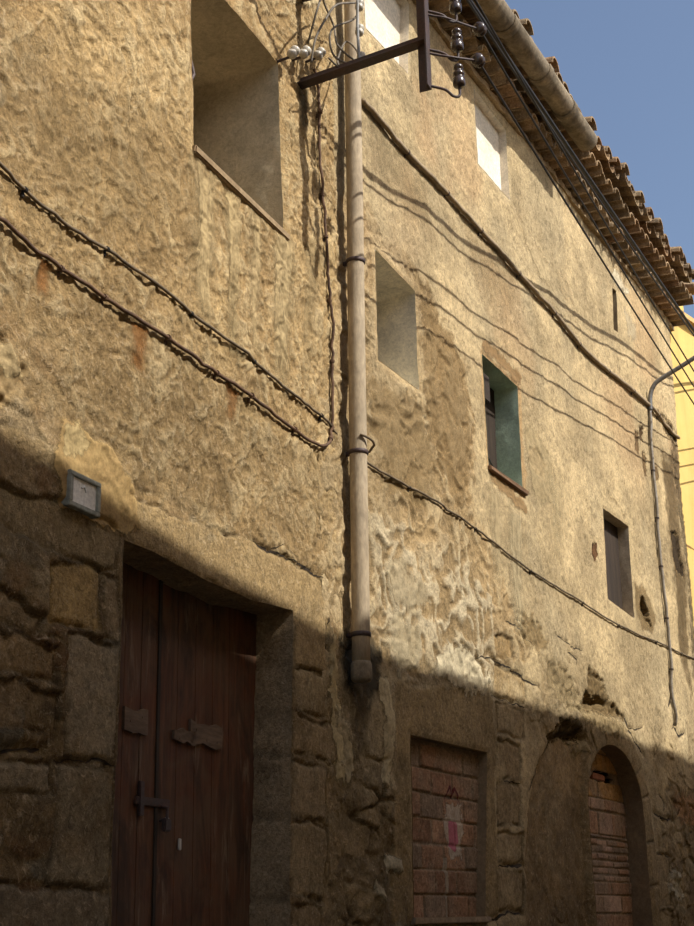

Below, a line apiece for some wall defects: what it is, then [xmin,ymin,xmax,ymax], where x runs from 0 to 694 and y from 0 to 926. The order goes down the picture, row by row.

spalling [635,584,655,633]
crack [476,655,535,685]
spalling [518,604,626,790]